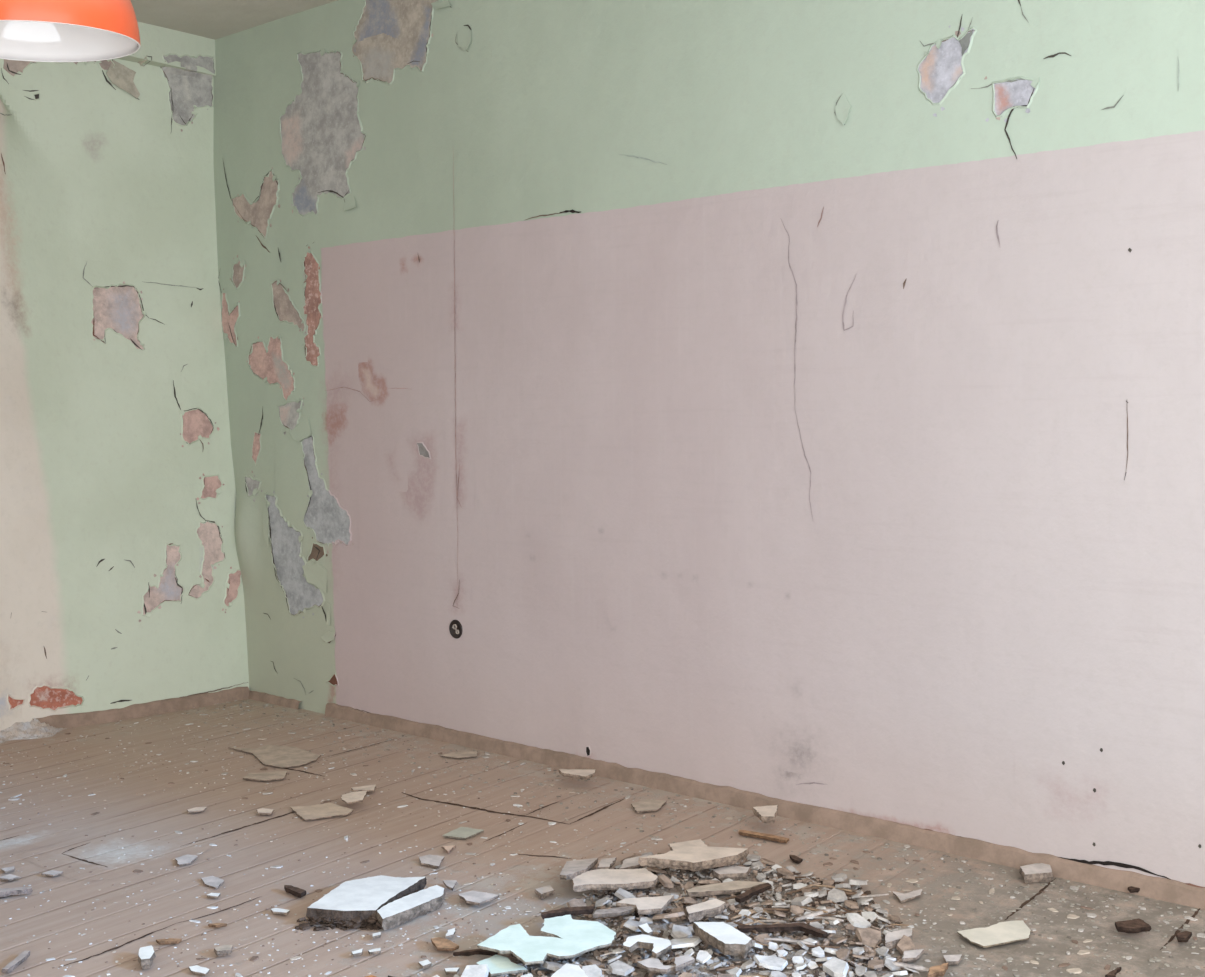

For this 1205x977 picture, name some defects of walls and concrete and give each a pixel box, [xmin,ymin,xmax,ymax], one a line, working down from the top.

peeling [1,59,38,84]
peeling [54,53,216,132]
peeling [223,0,451,252]
peeling [916,16,1040,159]
peeling [83,263,204,351]
peeling [173,364,220,449]
peeling [218,242,353,626]
crack [780,218,813,518]
peeling [137,473,241,622]
peeling [0,565,96,723]